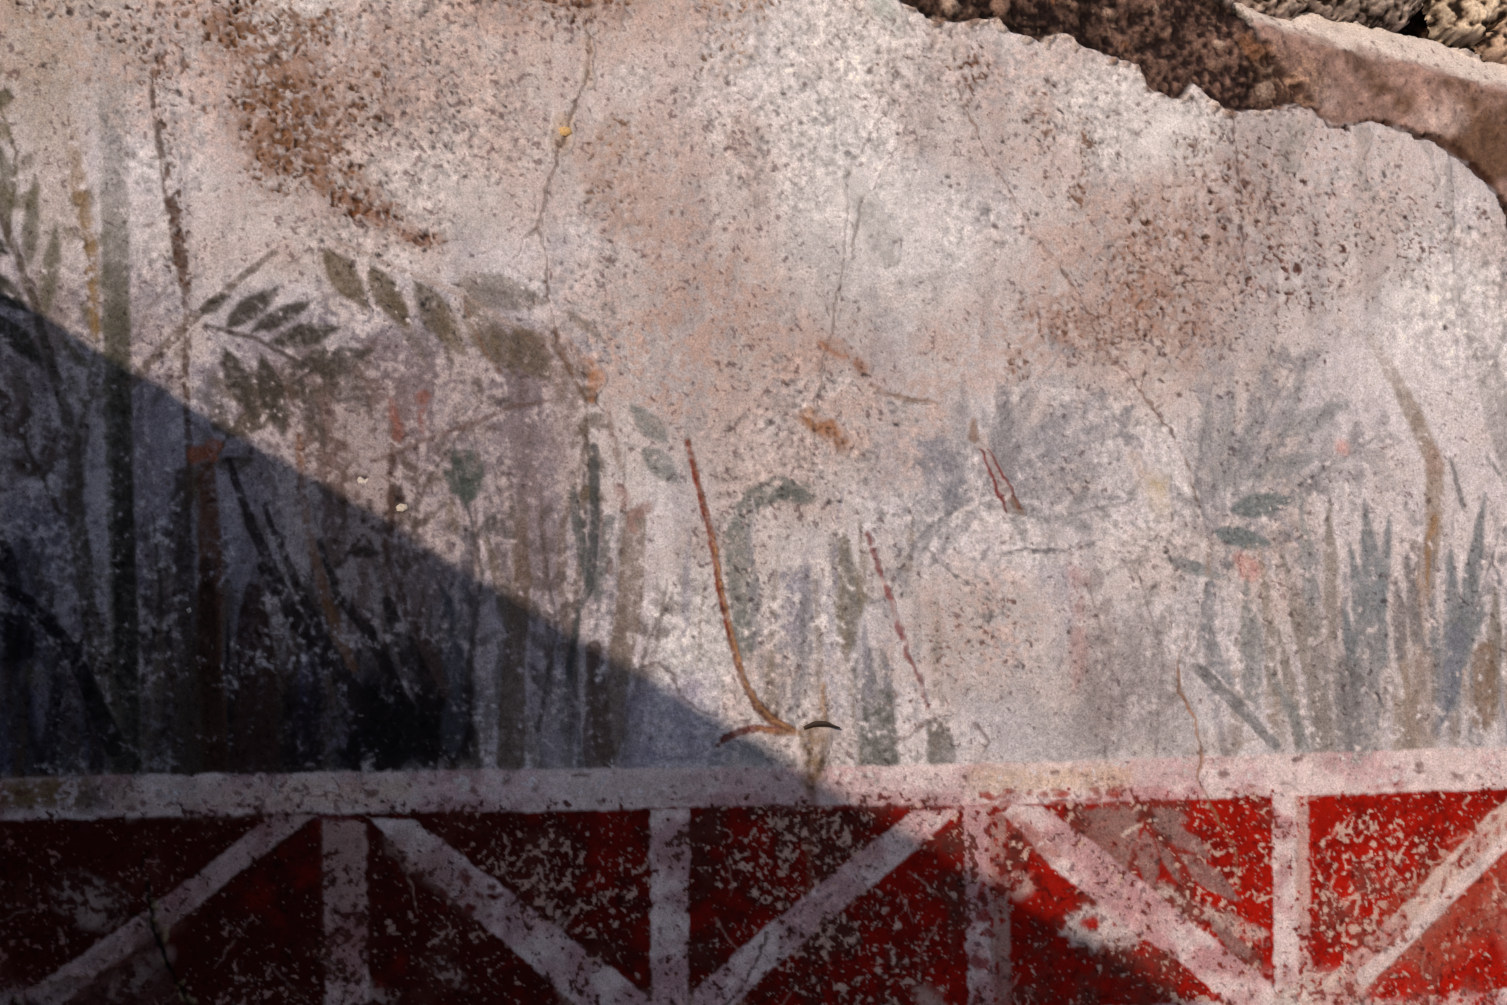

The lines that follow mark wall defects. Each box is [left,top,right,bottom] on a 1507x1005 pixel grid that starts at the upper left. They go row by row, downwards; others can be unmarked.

peeling [159,182,205,307]
peeling [0,0,662,259]
crack [510,19,592,406]
peeling [676,0,795,91]
peeling [779,295,899,362]
crack [811,92,908,446]
peeling [859,0,1507,387]
peeling [876,566,1055,761]
flaking render [20,897,200,1005]